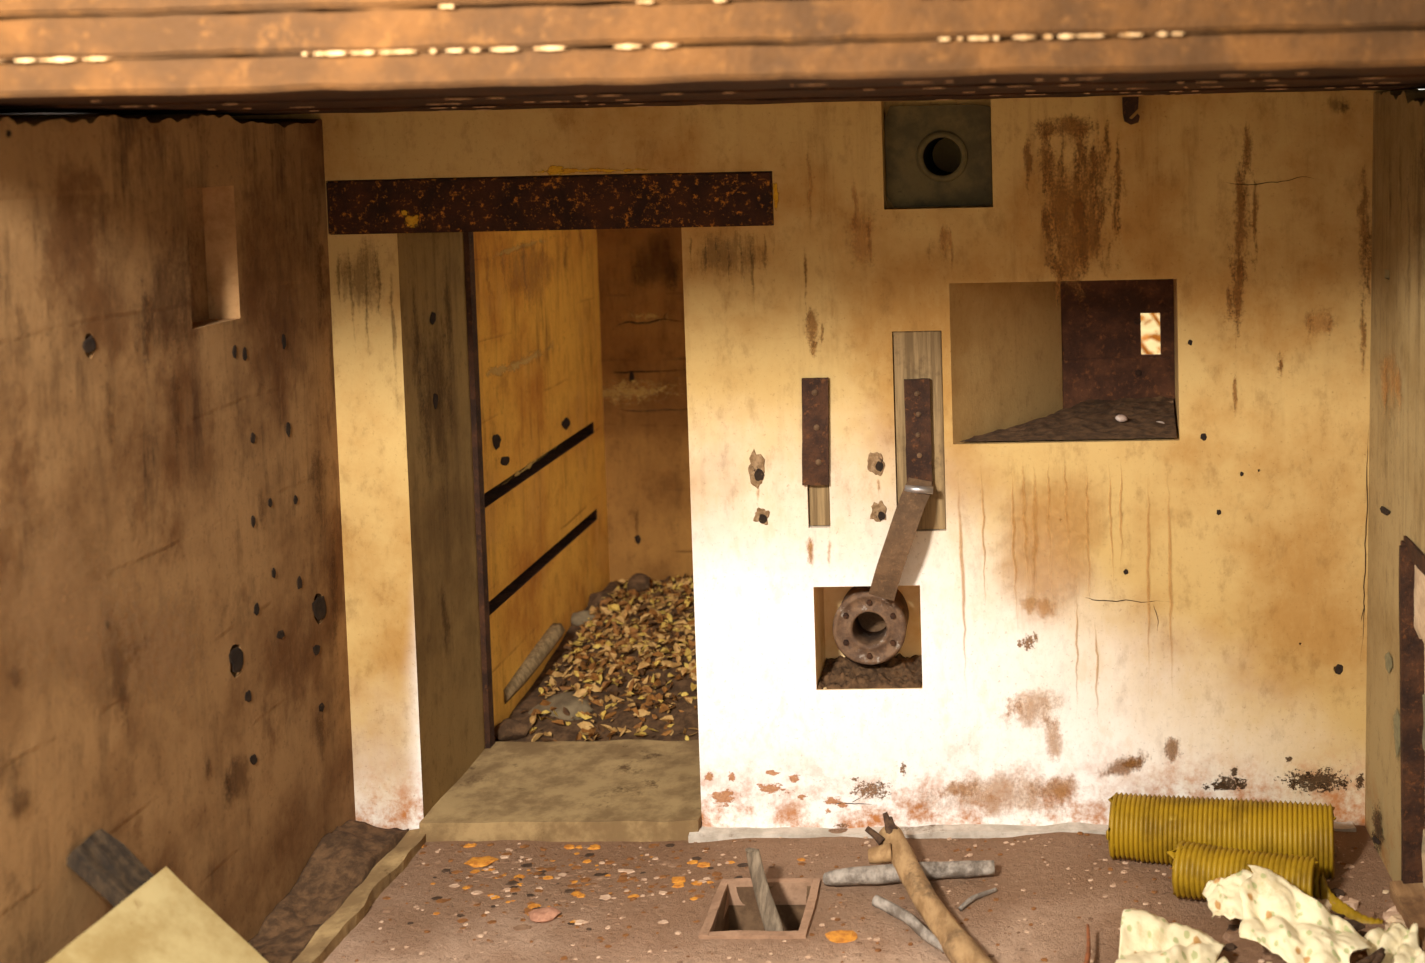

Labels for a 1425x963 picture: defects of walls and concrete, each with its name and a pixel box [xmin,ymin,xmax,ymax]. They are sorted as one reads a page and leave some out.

rust [1024,117,1120,302]
rust [1227,128,1258,318]
peeling [705,772,735,807]
peeling [757,770,808,800]
peeling [825,761,906,828]
mould [1201,767,1247,791]
mould [1274,756,1365,796]
mould [1371,802,1383,852]